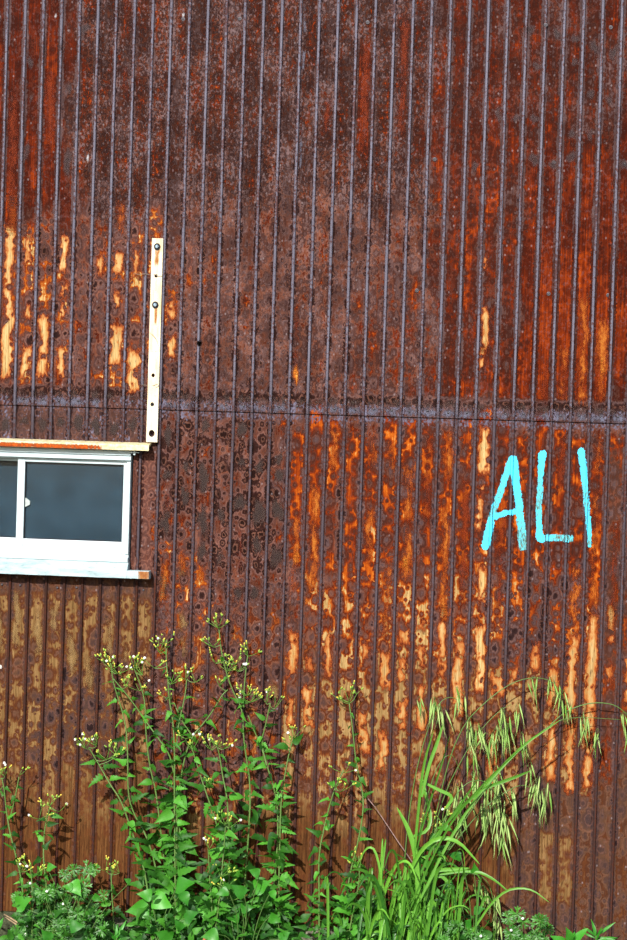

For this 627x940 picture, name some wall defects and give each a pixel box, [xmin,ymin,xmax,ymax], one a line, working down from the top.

peeling [0,224,70,380]
peeling [108,322,142,394]
corrosion [578,299,609,402]
corrosion [443,432,454,477]
peeling [474,424,491,533]
corrosion [293,485,320,590]
corrosion [383,533,412,623]
corrosion [390,446,450,617]
corrosion [569,565,598,621]
peeling [286,628,332,680]
peeling [362,604,520,718]
peeling [530,604,627,796]